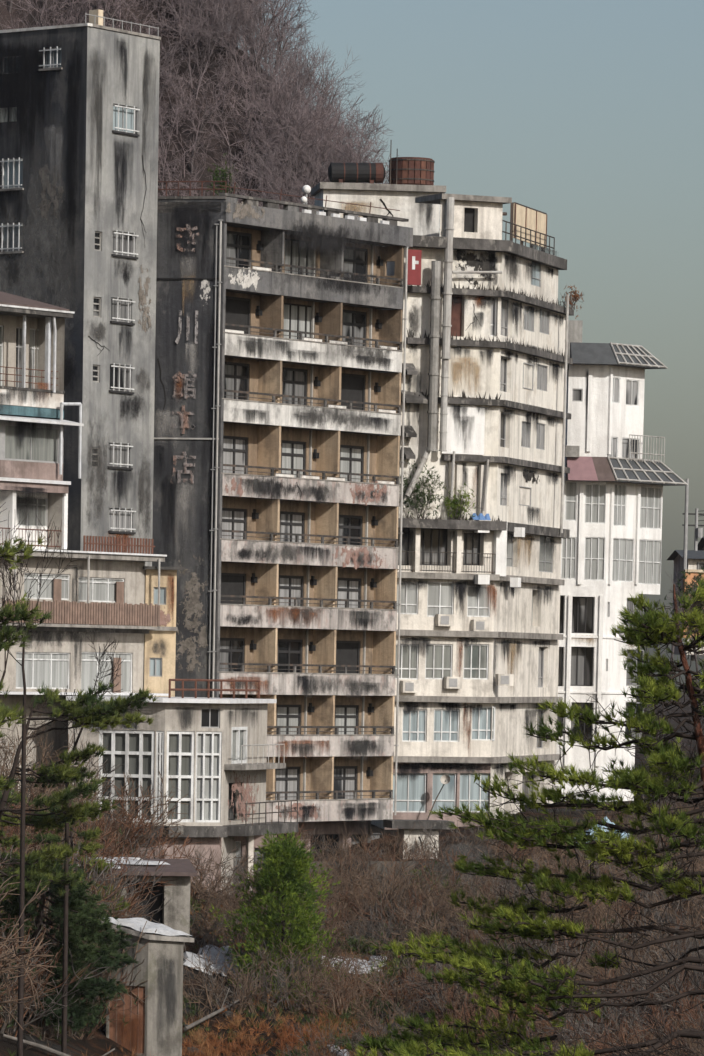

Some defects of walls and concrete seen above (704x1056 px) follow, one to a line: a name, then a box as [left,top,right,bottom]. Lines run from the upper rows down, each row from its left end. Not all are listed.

water stain [91,56,105,140]
water stain [49,60,79,221]
peeling [228,267,260,290]
water stain [453,347,493,377]
spalling [160,555,209,674]